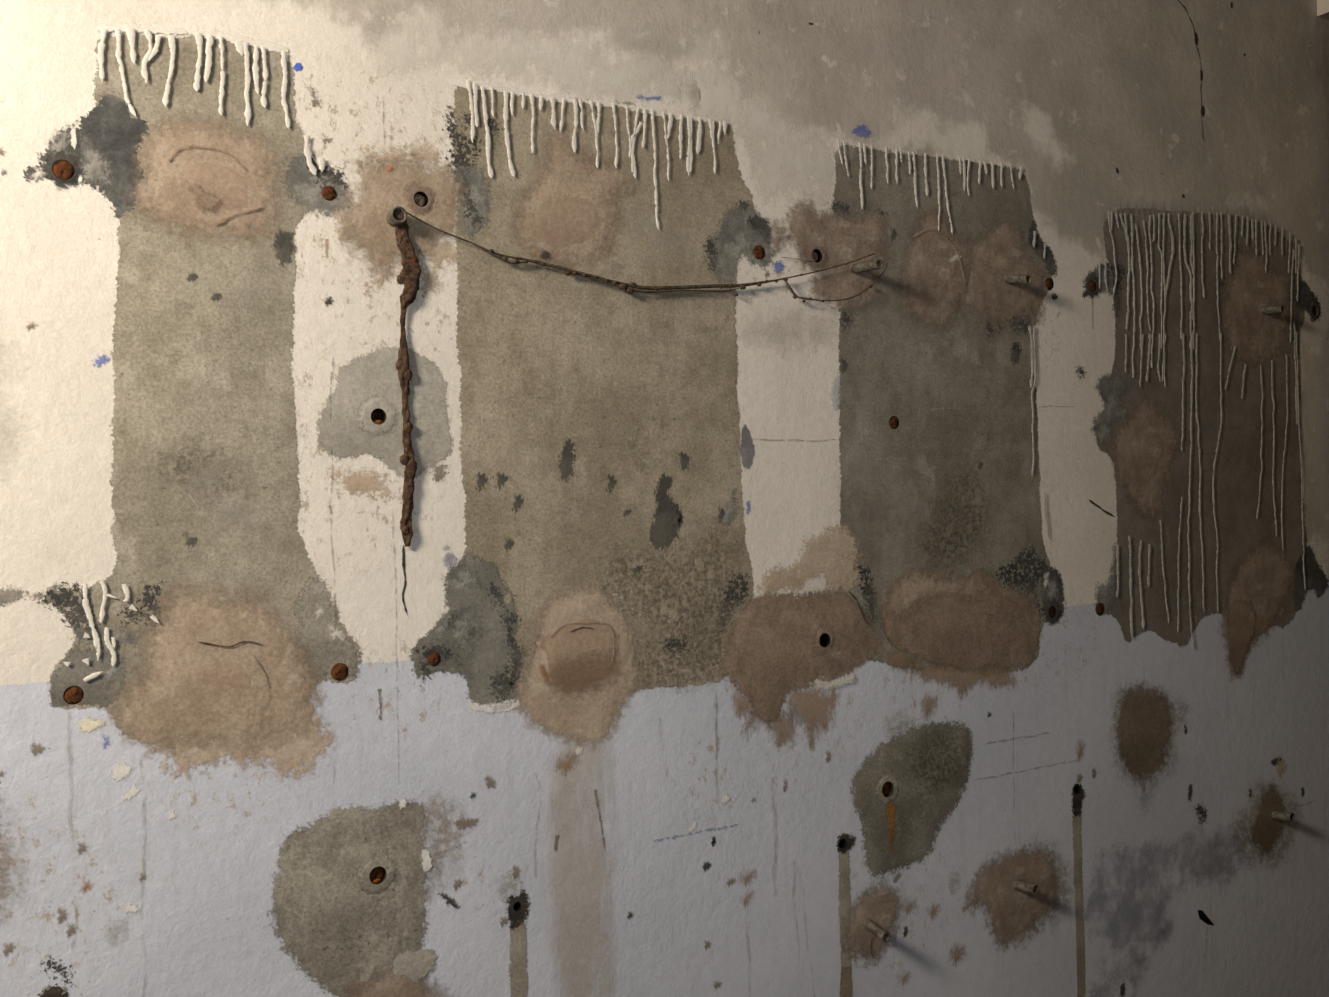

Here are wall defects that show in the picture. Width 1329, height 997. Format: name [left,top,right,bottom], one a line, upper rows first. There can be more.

crack [1178,0,1205,140]
damp [23,91,149,218]
damp [281,155,352,216]
damp [440,106,503,240]
damp [703,200,775,289]
damp [1028,220,1057,276]
rust [395,221,421,547]
damp [1076,365,1128,445]
damp [38,576,163,681]
damp [409,552,529,714]
damp [992,542,1066,618]
damp [1293,545,1329,612]